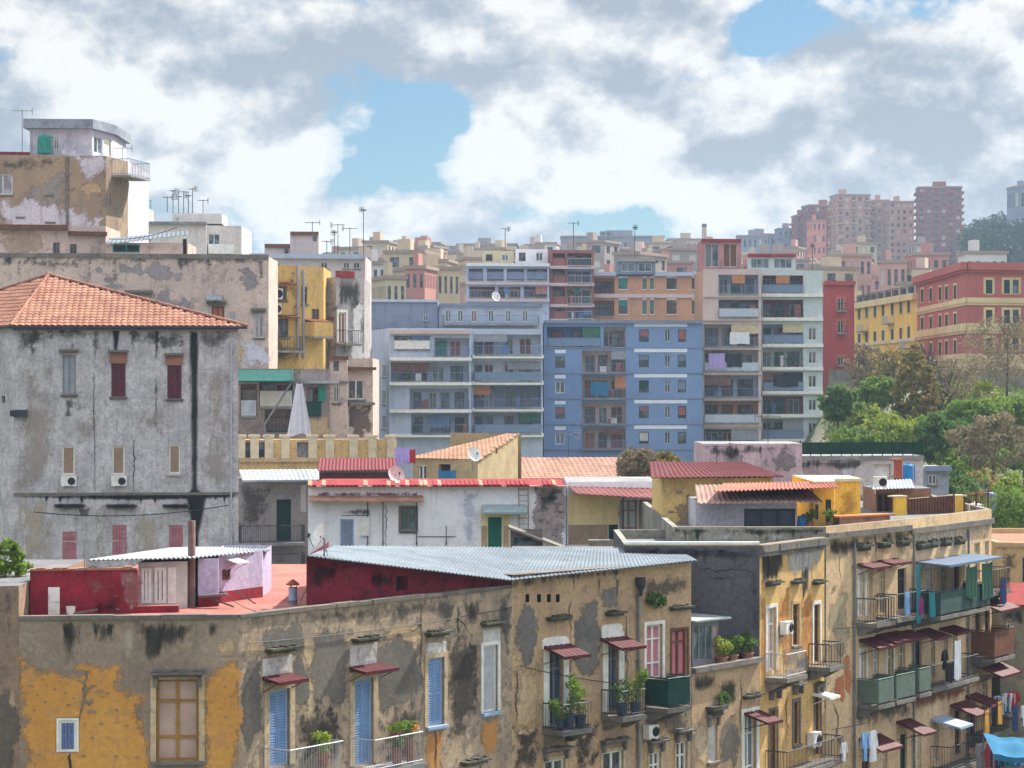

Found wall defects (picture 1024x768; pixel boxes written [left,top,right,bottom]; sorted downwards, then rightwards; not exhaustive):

peeling [95,261,193,320]
peeling [238,268,258,291]
damp [341,283,359,306]
damp [19,331,265,558]
flaking render [349,405,372,437]
damp [64,626,74,650]
damp [125,626,185,656]
flaking render [828,585,851,702]
peeling [9,656,150,768]
peeling [205,638,244,768]